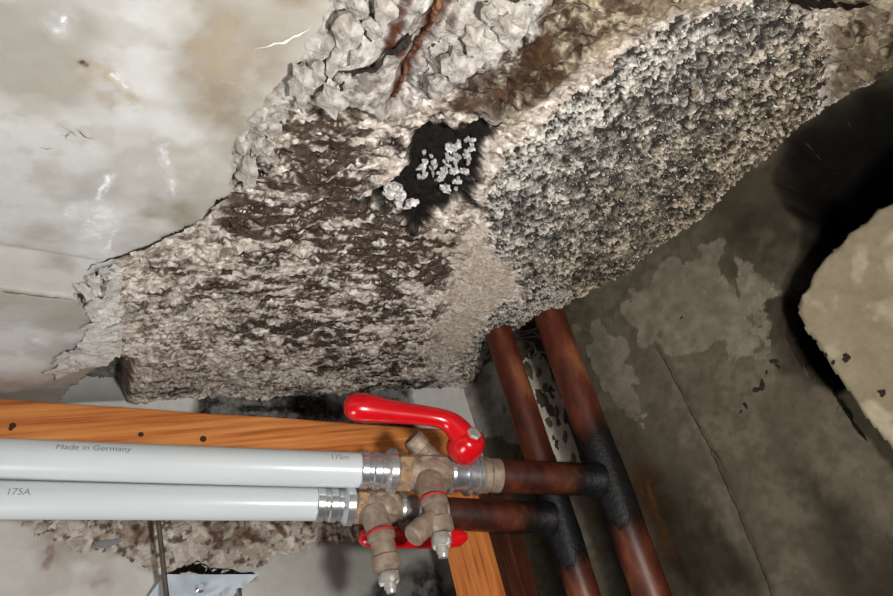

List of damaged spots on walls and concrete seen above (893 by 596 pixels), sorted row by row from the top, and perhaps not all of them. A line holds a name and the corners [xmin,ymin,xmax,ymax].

corrosion [384,0,449,98]
crack [0,290,84,301]
damp [132,0,643,428]
spalling [45,0,893,462]
flaking render [22,520,364,574]
crack [655,343,772,596]